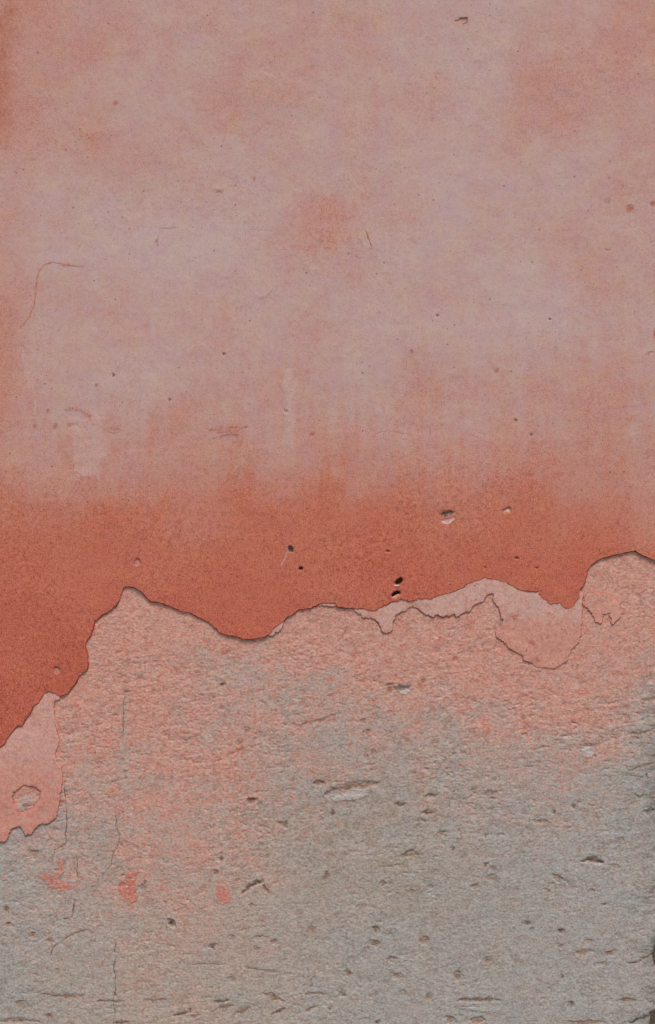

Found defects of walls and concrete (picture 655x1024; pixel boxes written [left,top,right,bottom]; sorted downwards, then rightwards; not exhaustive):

spalling [0,550,655,1024]